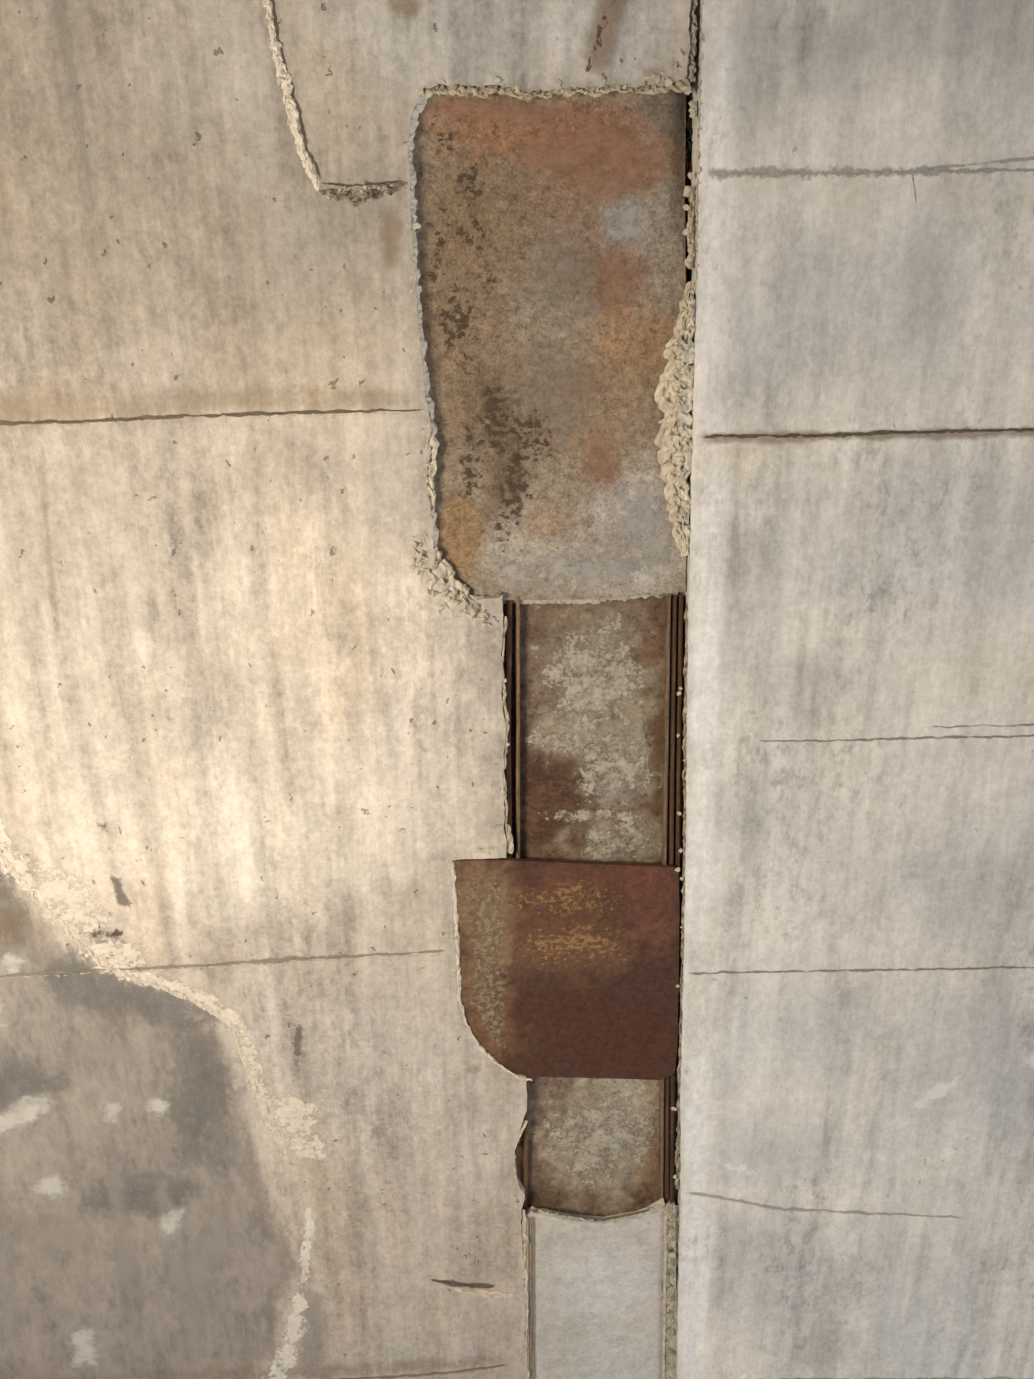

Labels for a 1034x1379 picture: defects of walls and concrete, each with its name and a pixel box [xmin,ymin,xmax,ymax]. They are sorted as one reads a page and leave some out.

crack [262,0,411,207]
spalling [15,0,704,854]
rust [511,775,576,844]
peeling [0,808,437,1160]
water stain [0,873,315,1379]
spalling [432,1120,530,1379]
crack [691,1192,958,1218]